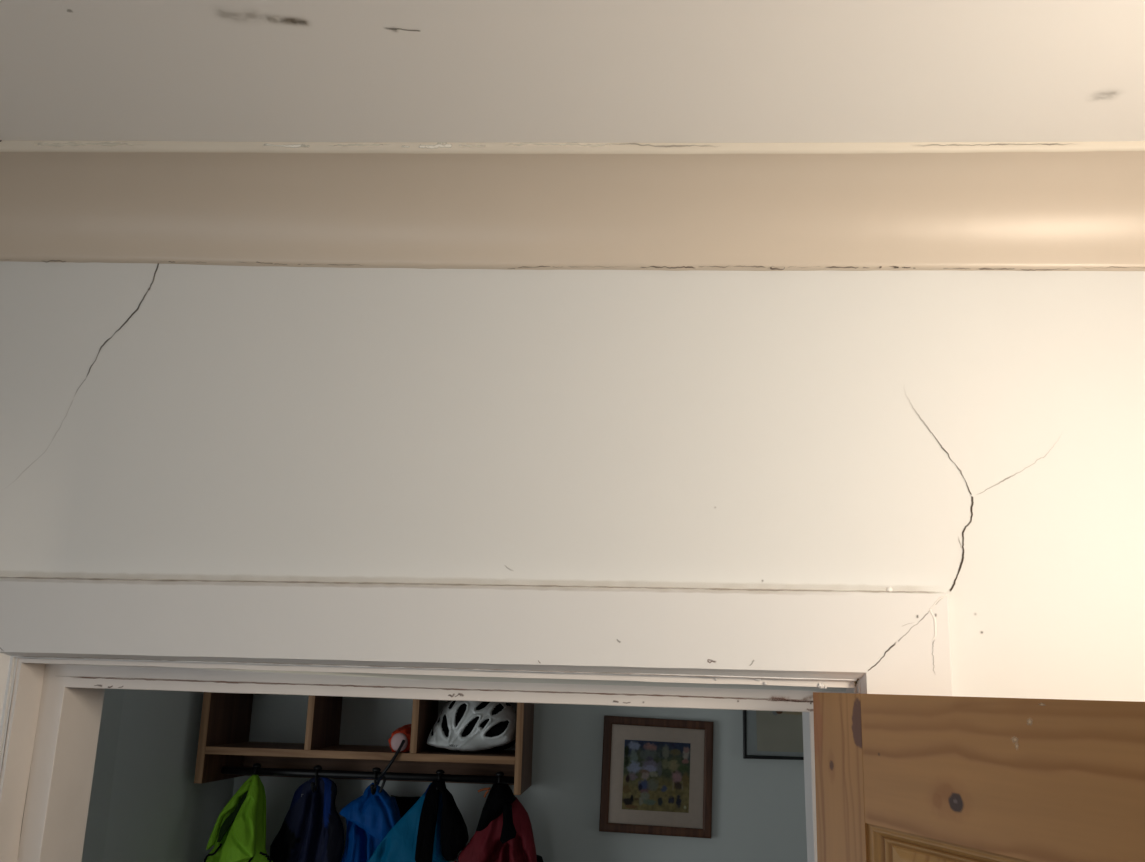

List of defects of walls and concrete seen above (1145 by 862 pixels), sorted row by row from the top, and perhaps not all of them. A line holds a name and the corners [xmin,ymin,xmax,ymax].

crack [77,261,171,390]